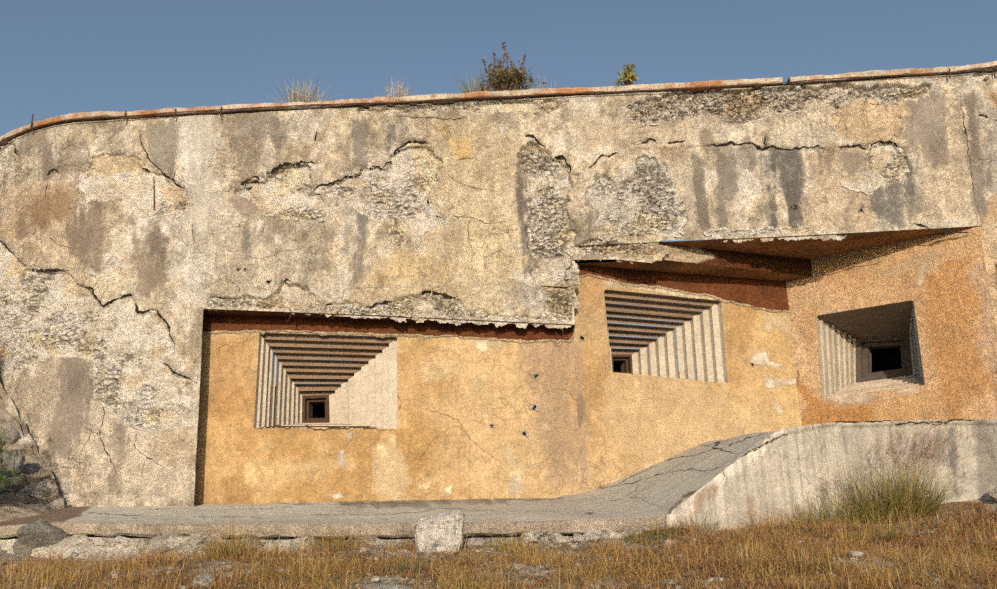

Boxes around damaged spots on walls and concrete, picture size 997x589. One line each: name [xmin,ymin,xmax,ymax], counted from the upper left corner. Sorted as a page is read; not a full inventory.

spalling [625,83,930,126]
spalling [971,71,997,82]
crack [139,136,189,197]
leakage [693,137,752,230]
leakage [765,135,803,228]
spalling [840,142,910,195]
spalling [204,141,688,329]
spalling [0,242,194,431]
crack [0,238,197,383]
peeling [605,281,704,299]
leakage [47,357,91,458]
crack [77,394,560,518]